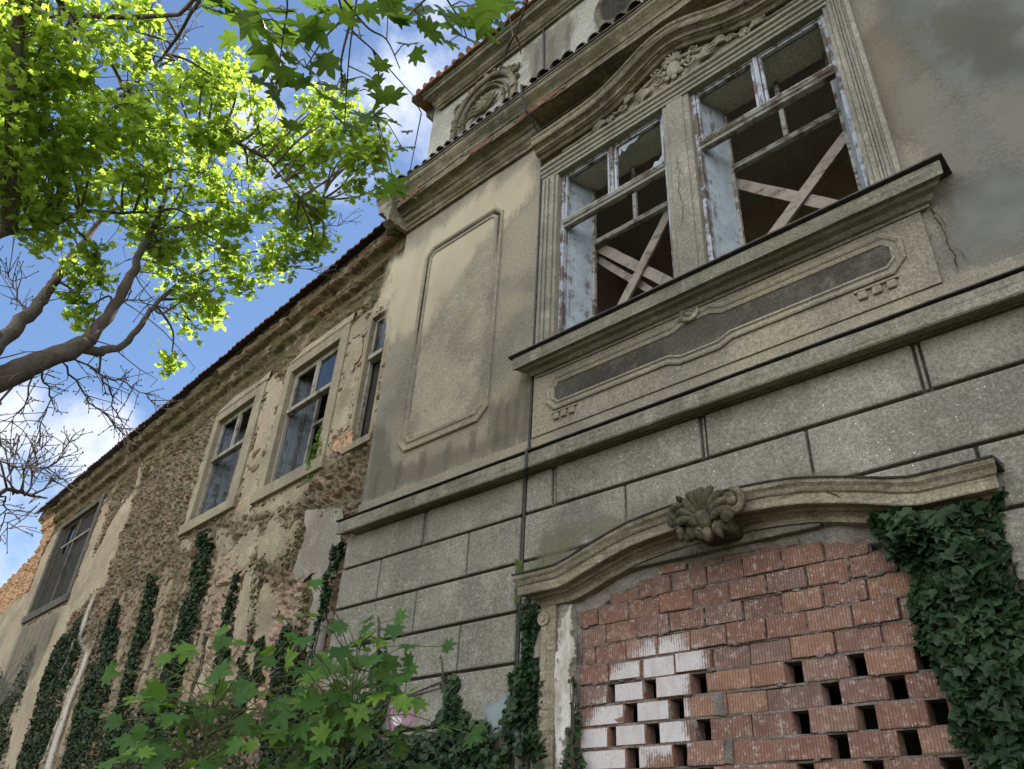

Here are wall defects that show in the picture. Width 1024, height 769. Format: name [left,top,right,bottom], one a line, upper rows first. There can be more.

peeling [0,232,407,769]
crack [929,202,968,269]